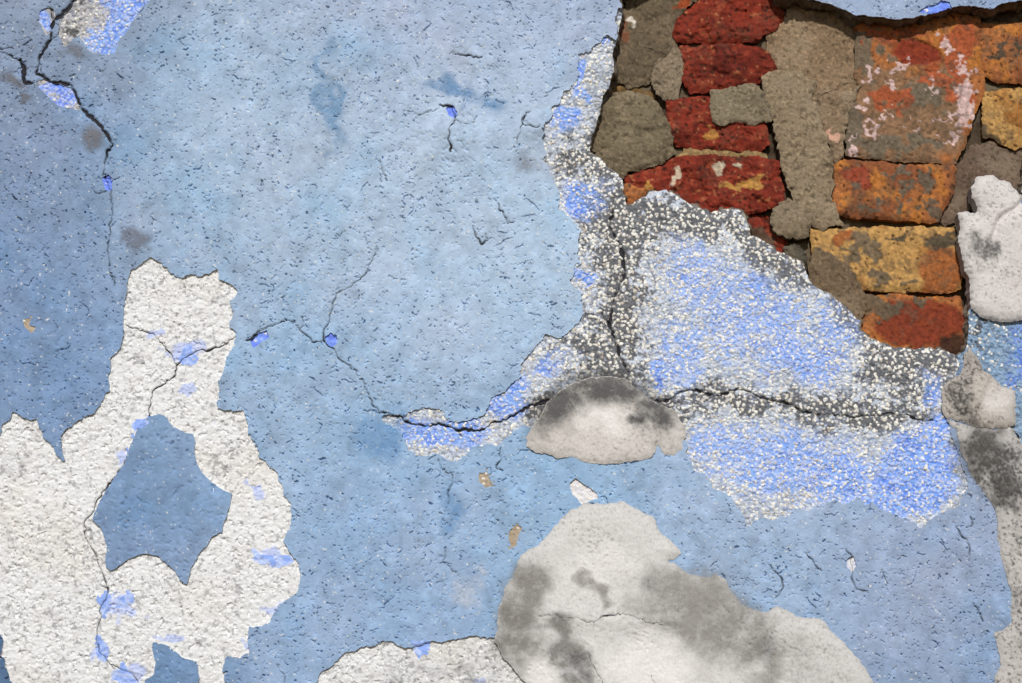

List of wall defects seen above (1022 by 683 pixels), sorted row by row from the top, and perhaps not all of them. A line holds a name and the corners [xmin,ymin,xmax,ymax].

peeling [37,0,149,60]
crack [0,0,119,286]
crack [606,209,626,368]
spalling [382,0,1022,530]
peeling [0,257,301,683]
peeling [506,524,524,549]
crack [646,385,933,421]
peeling [317,635,525,683]